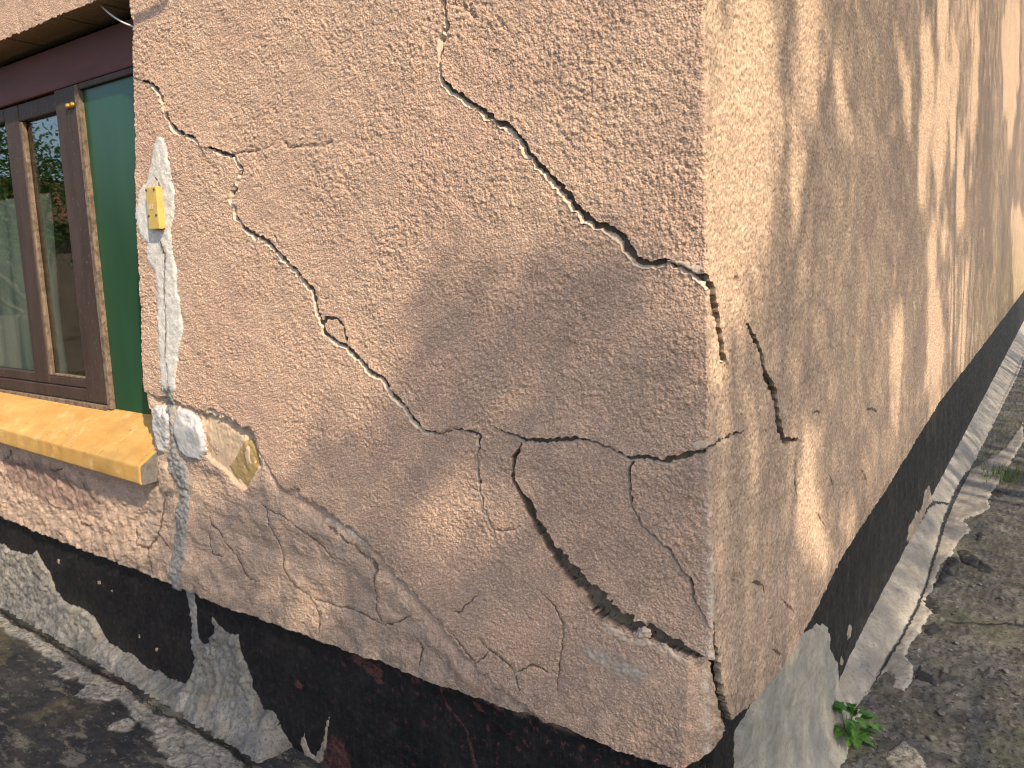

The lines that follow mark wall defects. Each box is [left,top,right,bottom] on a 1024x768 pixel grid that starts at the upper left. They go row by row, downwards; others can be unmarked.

crack [436,0,725,364]
crack [146,81,740,719]
flaking render [203,409,263,488]
crack [775,419,796,490]
crack [136,501,170,574]
peeling [907,486,932,541]
crack [752,580,794,612]
flaking render [602,622,696,666]
peeling [300,717,351,768]